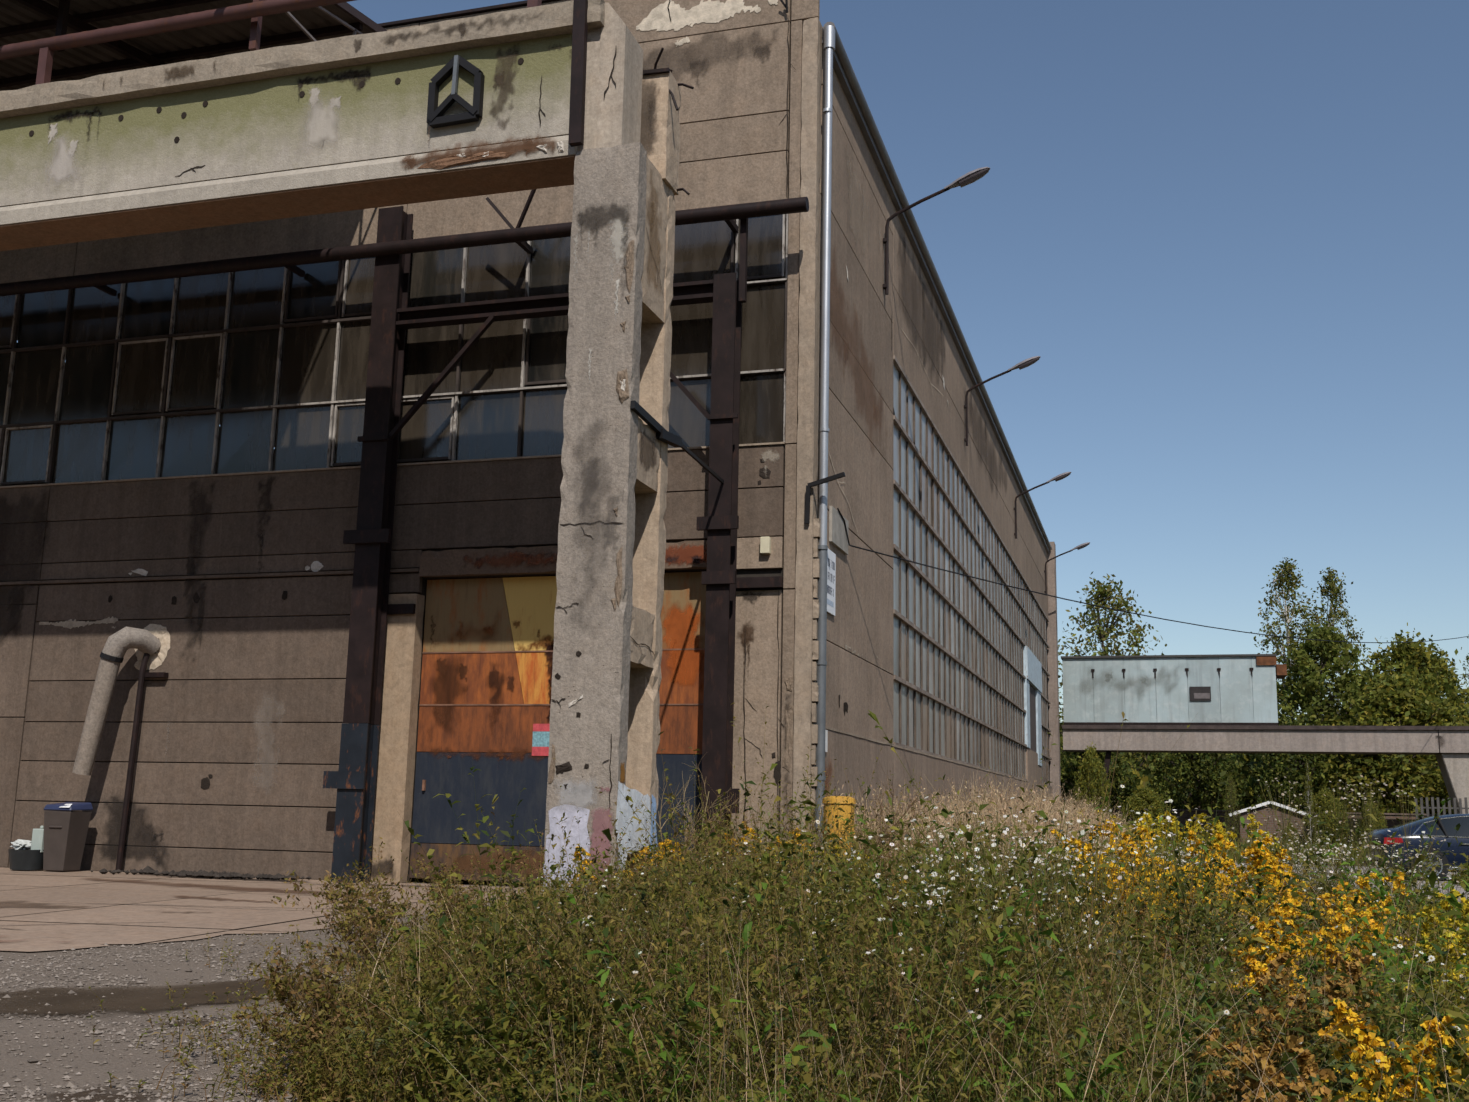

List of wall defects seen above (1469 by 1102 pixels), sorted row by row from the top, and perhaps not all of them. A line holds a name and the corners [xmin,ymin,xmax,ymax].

water stain [298,69,370,143]
water stain [387,19,511,43]
water stain [491,46,519,128]
peeling [636,0,778,111]
corrosion [402,127,555,169]
water stain [575,204,628,313]
corrosion [433,660,467,726]
corrosion [489,667,514,717]
corrosion [519,630,554,721]
corrosion [663,605,704,684]
water stain [102,797,307,882]